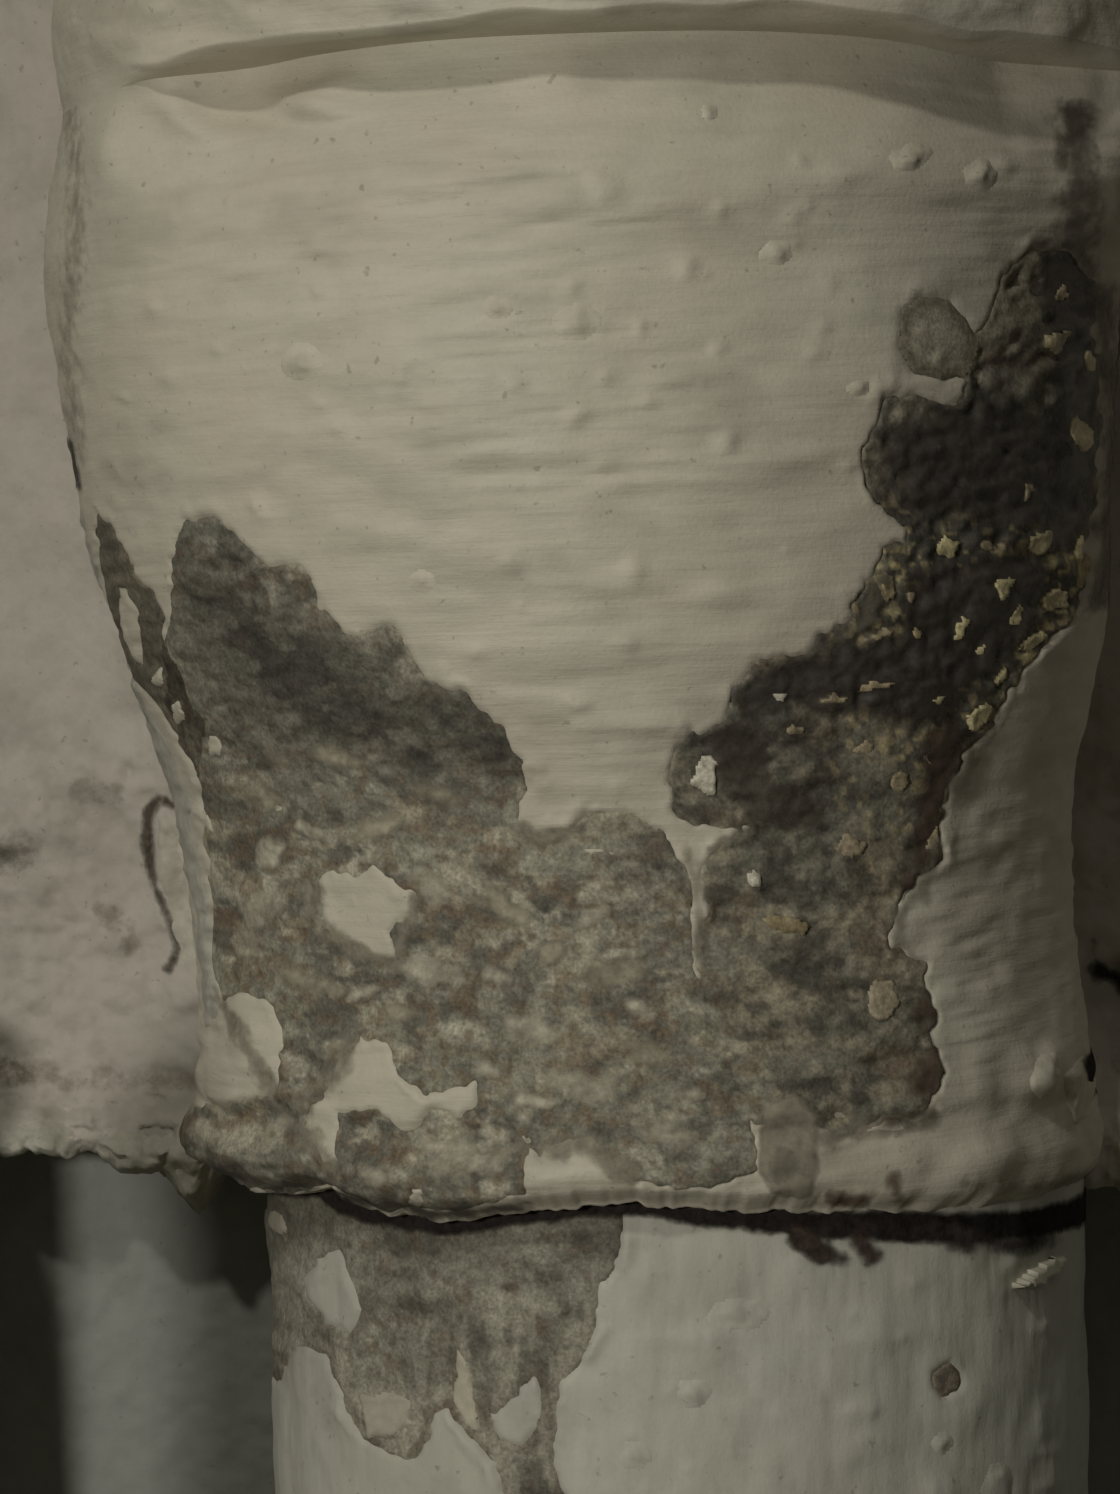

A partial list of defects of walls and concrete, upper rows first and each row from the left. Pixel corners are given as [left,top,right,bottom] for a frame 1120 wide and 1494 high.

crack [141,796,179,972]
peeling [93,250,1104,1494]
crack [1090,961,1120,991]
crack [1084,1049,1097,1095]
spalling [0,1116,82,1160]
crack [268,1188,1086,1266]